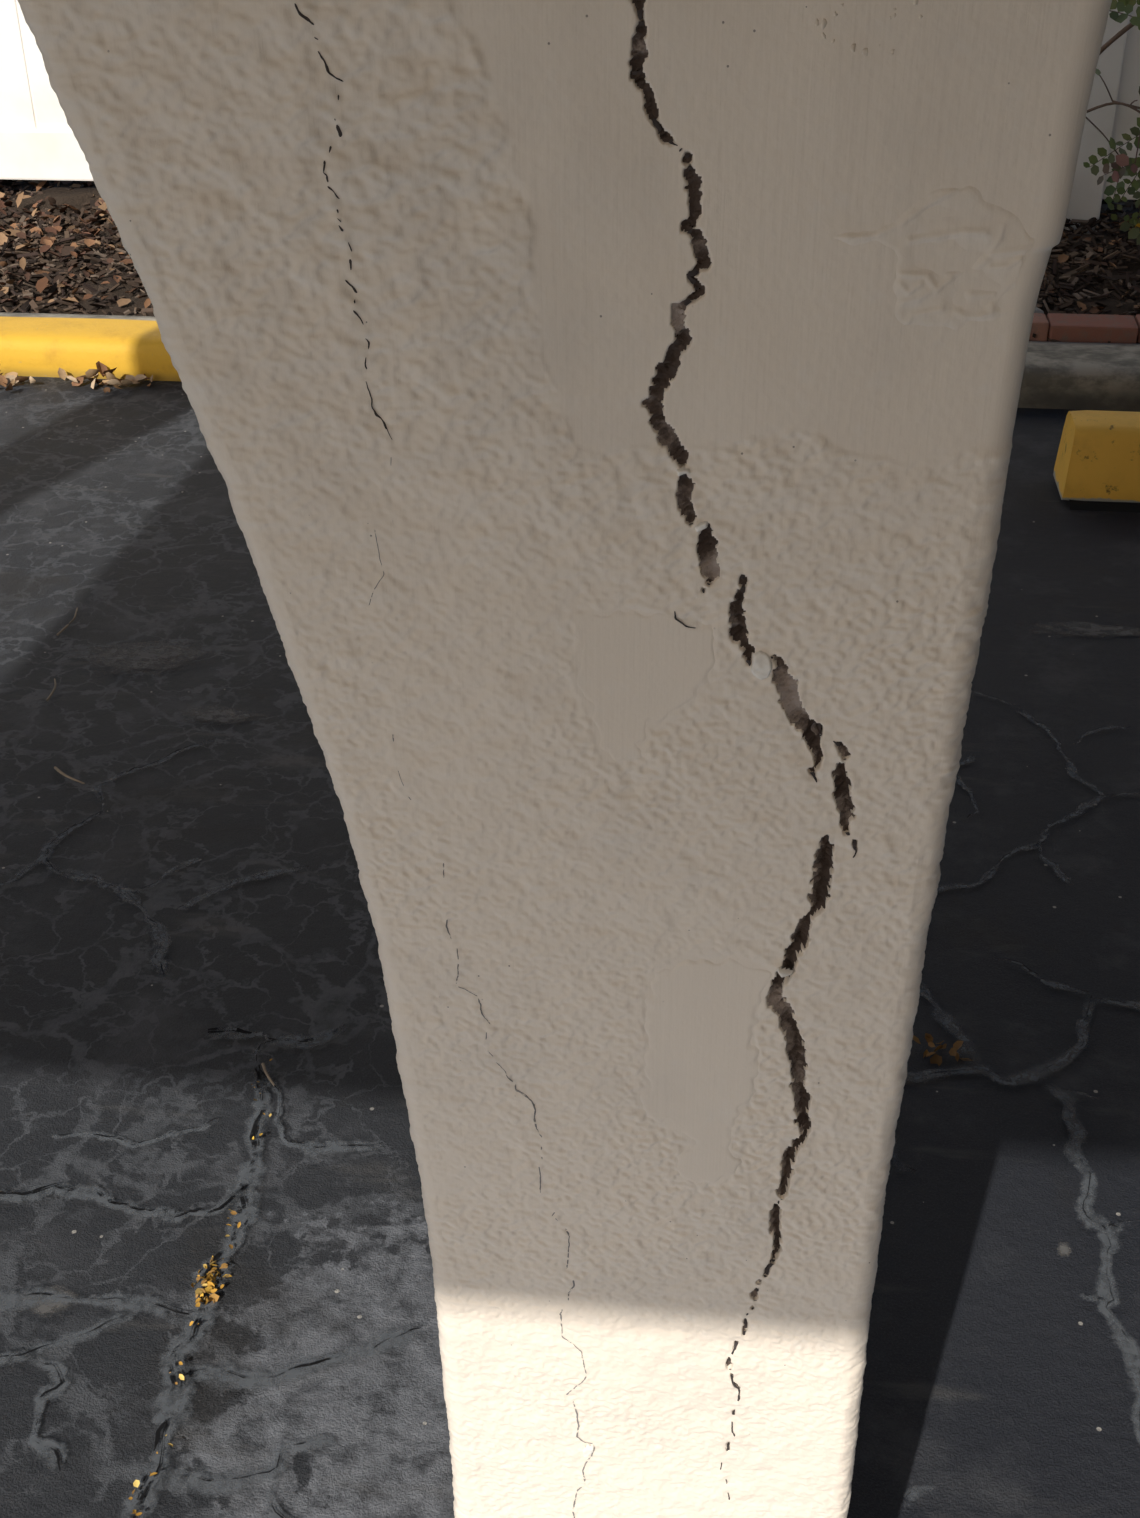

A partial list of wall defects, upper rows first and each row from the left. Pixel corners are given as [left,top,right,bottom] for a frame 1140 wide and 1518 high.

crack [629,0,857,1500]